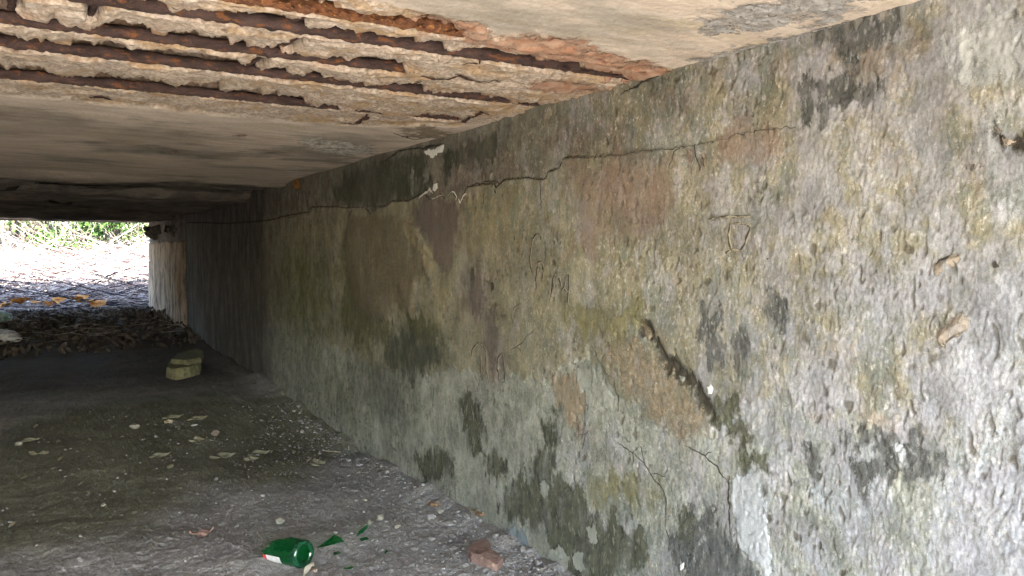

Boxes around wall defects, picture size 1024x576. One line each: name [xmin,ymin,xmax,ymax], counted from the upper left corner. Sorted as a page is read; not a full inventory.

spalling [0,0,669,111]
spalling [414,113,459,121]
crack [185,126,795,325]
water stain [459,389,508,487]
water stain [540,366,585,448]
mould [710,393,769,476]
mould [668,498,757,576]